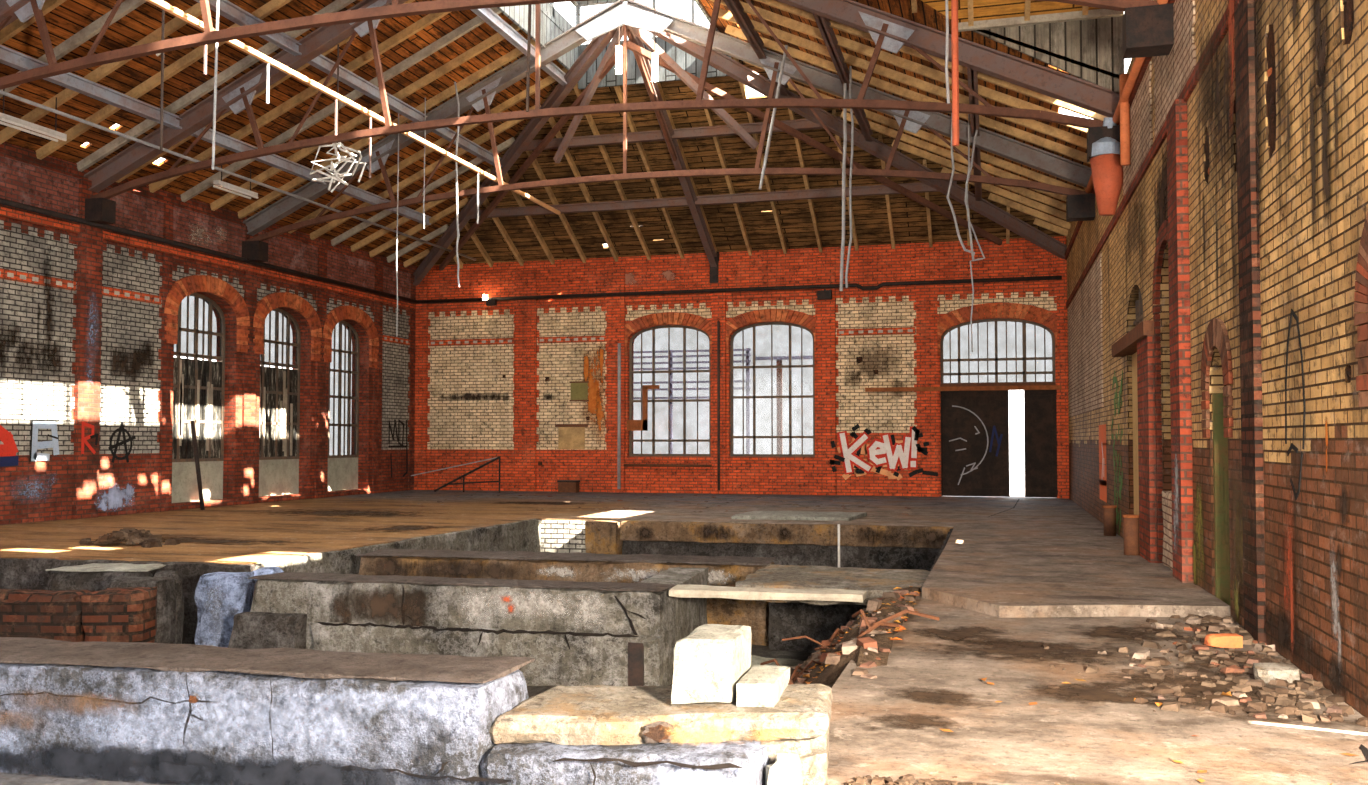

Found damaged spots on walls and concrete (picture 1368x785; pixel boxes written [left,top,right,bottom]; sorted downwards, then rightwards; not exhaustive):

damp [1196,35,1235,303]
damp [1277,36,1339,240]
crack [0,679,215,745]
crack [553,758,743,785]